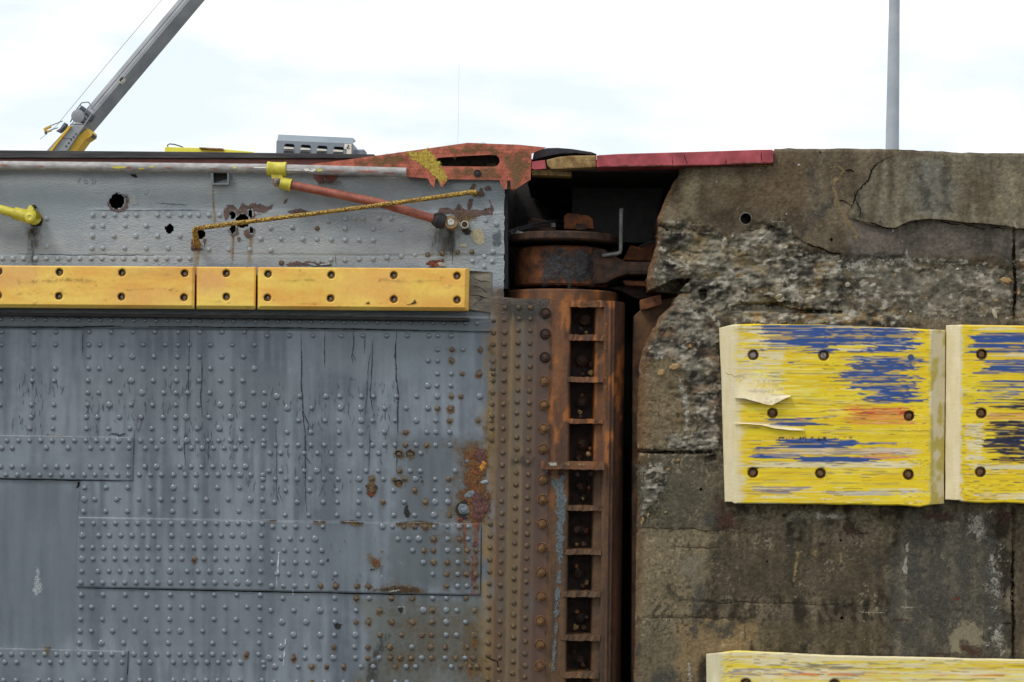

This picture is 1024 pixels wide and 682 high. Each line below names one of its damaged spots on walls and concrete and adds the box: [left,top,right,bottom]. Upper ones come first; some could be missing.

crack [799,239,841,255]
crack [838,156,1024,315]
spalling [635,222,1024,526]
rust [446,345,495,595]
rust [352,583,425,664]